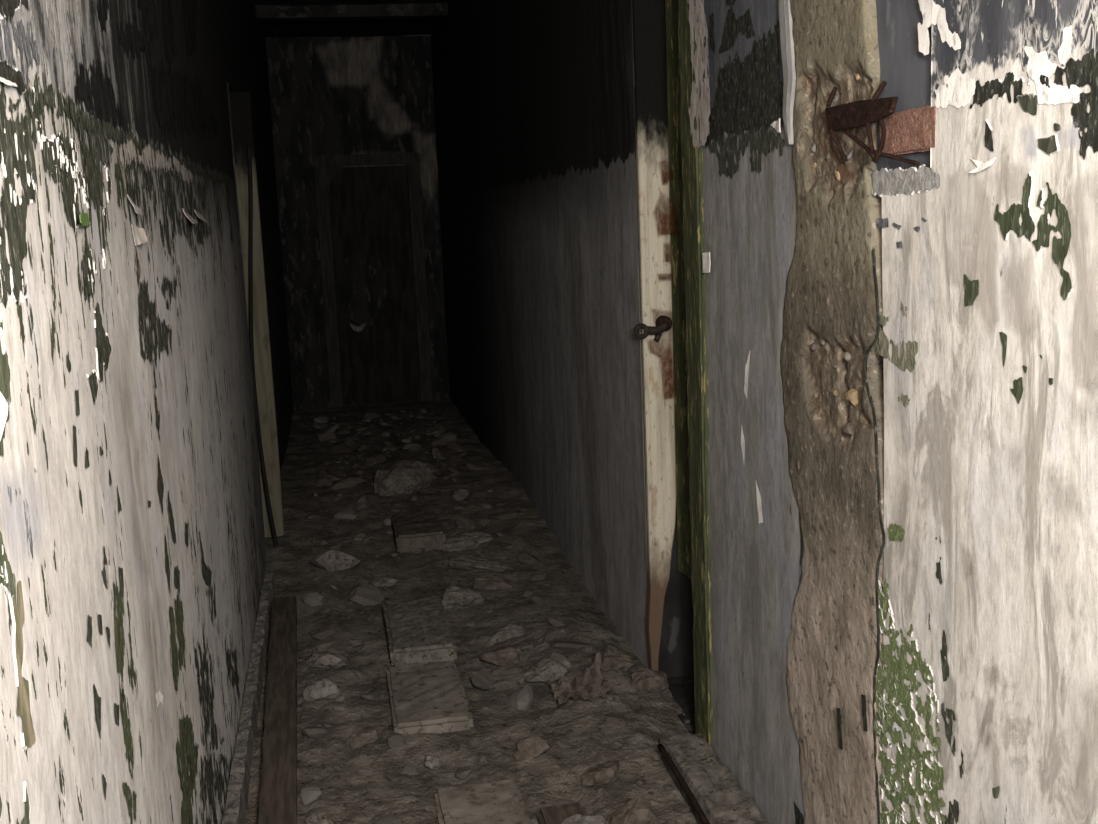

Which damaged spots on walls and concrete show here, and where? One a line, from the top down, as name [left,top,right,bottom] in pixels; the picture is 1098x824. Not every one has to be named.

peeling [687,0,785,178]
peeling [918,0,961,55]
peeling [969,119,996,173]
peeling [935,25,1098,160]
peeling [0,0,230,469]
peeling [994,171,1073,300]
peeling [0,531,36,751]
peeling [87,547,137,824]
peeling [148,456,228,824]
peeling [940,630,949,681]
peeling [941,702,964,779]
peeling [941,799,959,824]